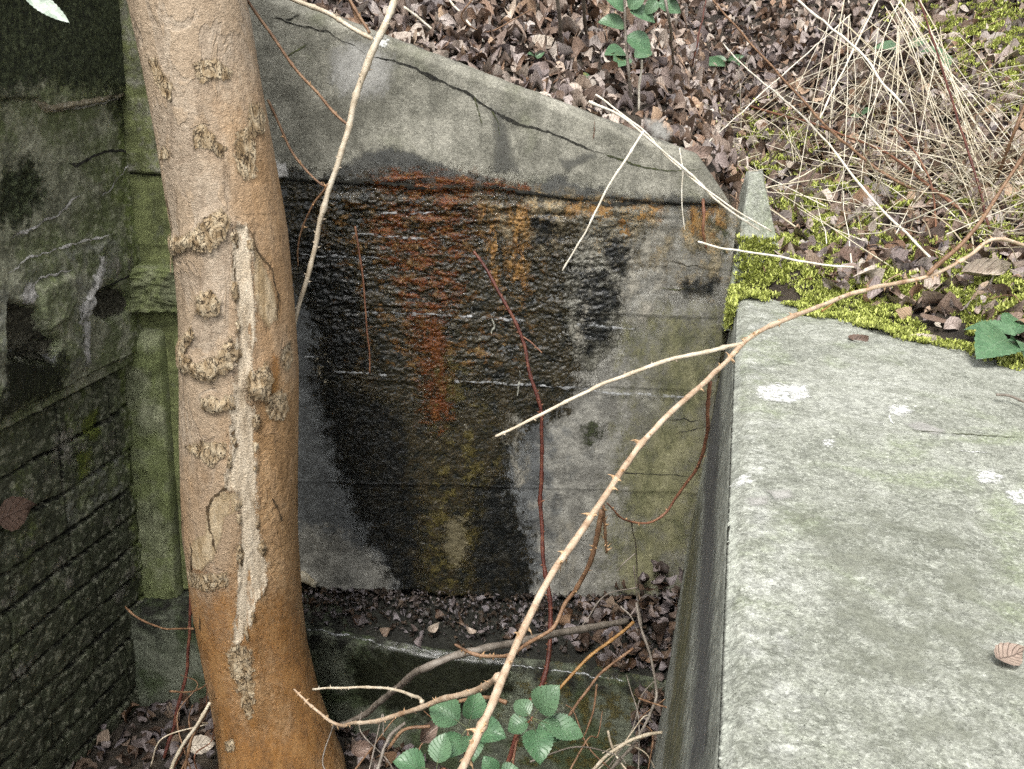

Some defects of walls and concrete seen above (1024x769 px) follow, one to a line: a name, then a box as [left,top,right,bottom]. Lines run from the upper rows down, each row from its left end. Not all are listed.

crack [276,14,702,171]
damp [276,110,723,602]
corrosion [371,175,738,433]